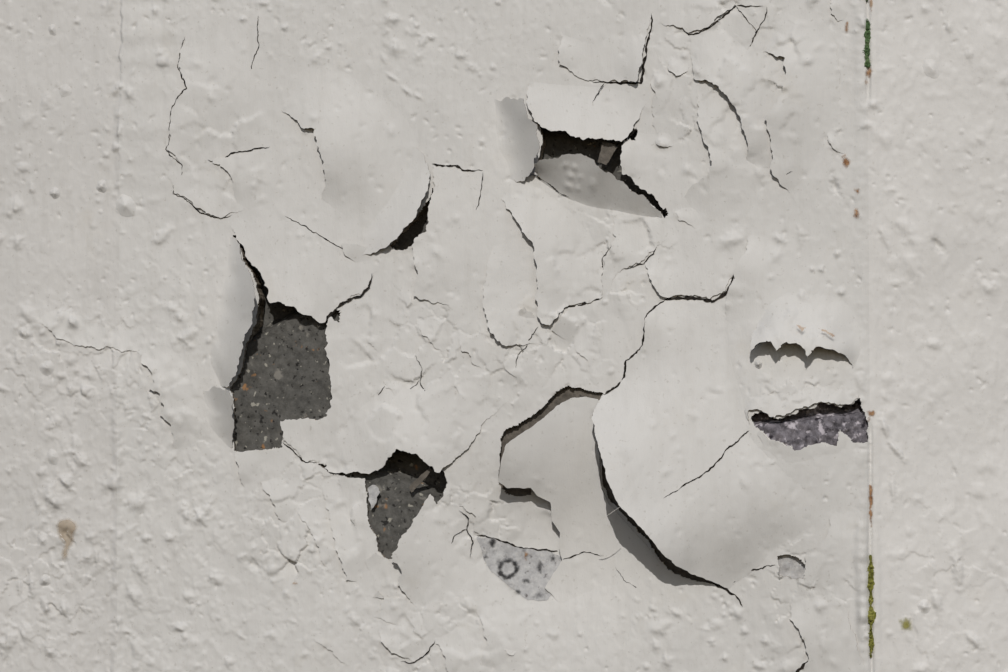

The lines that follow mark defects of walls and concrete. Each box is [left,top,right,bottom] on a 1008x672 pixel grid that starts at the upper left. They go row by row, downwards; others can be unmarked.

peeling [37,0,868,611]
peeling [778,505,872,672]